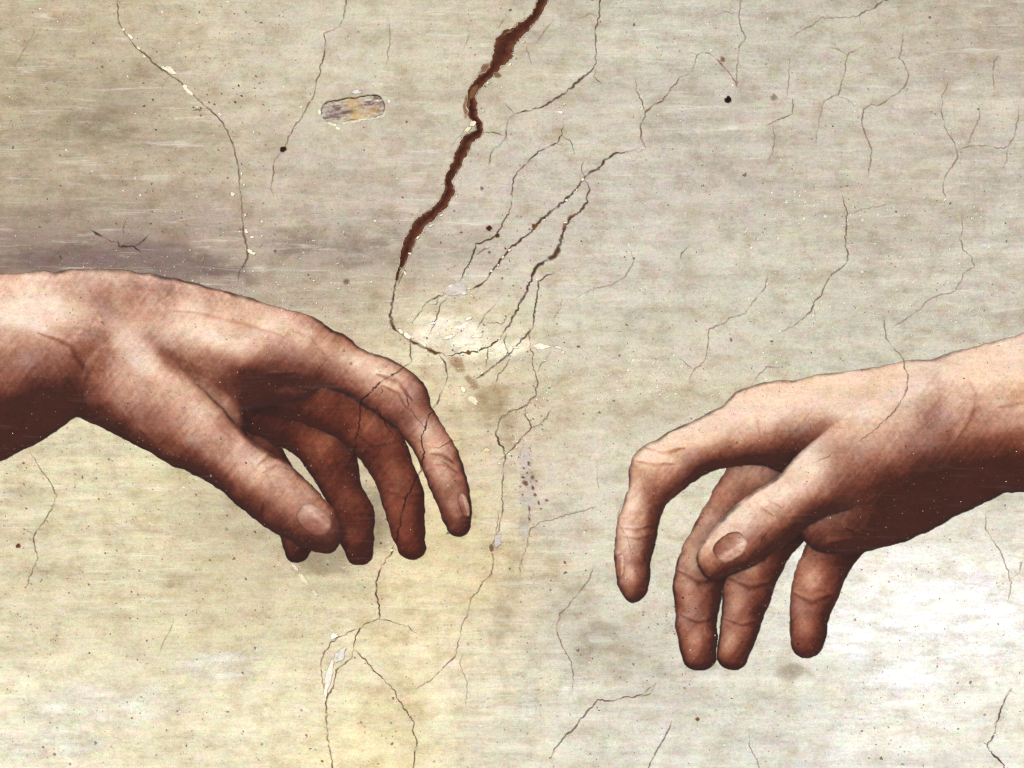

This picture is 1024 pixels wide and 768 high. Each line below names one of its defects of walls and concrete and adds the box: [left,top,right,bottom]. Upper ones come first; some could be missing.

crack [117,4,256,272]
crack [286,36,326,144]
crack [695,7,746,83]
crack [861,46,909,170]
crack [941,87,1019,193]
crack [808,199,849,314]
crack [321,0,678,768]
crack [685,280,767,376]